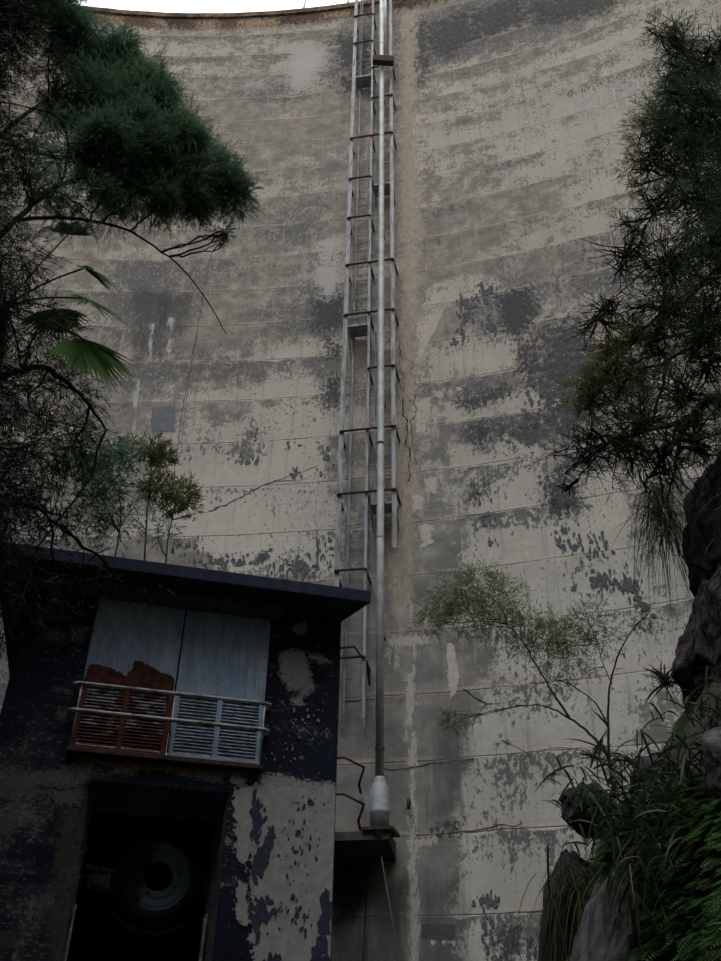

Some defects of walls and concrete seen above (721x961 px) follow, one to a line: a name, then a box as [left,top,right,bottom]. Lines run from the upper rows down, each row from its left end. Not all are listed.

damp [140,290,183,360]
damp [131,379,143,435]
crack [209,465,318,512]
damp [378,0,625,961]
peeling [169,614,336,961]